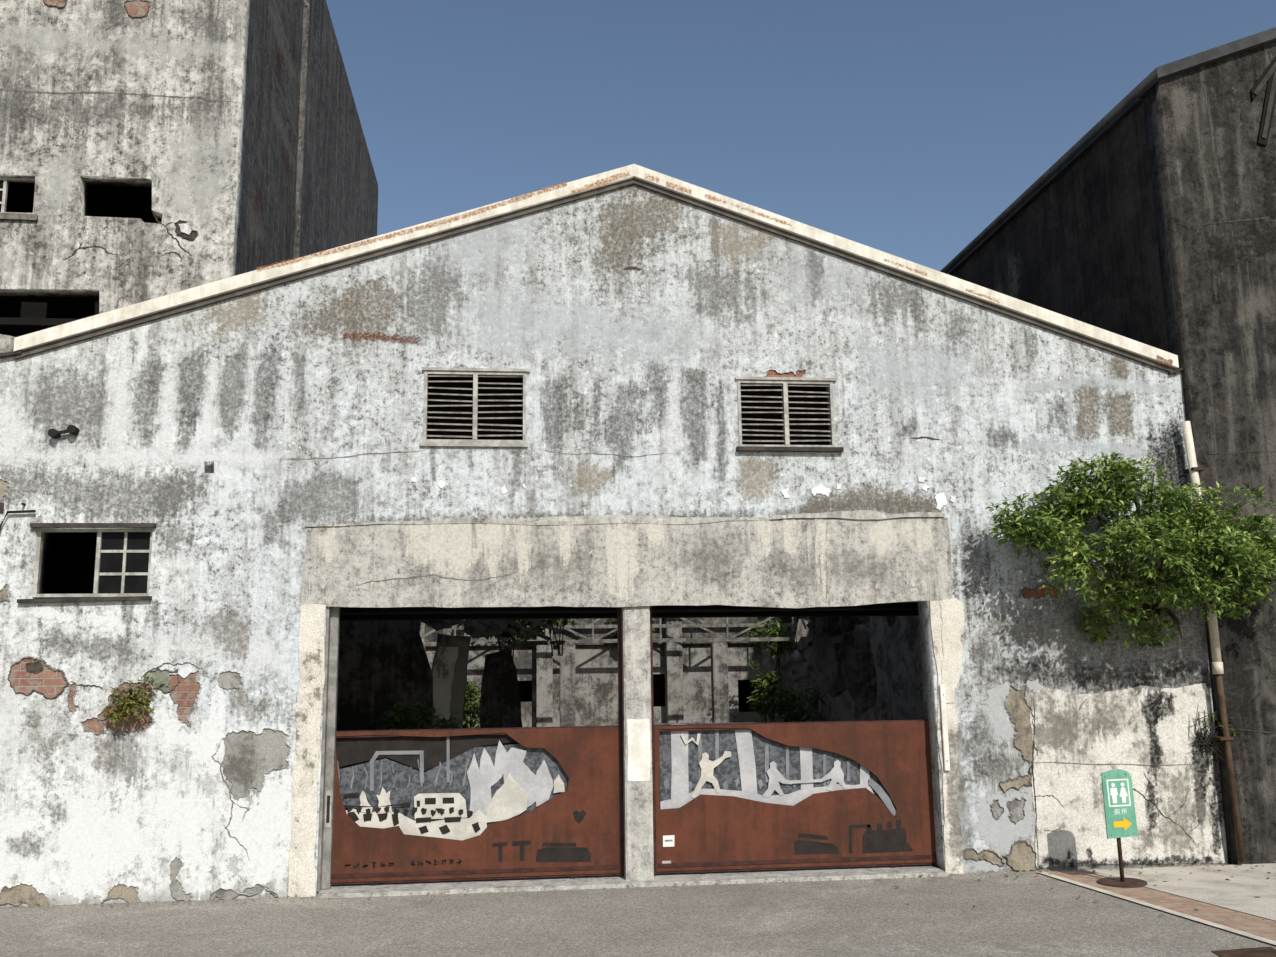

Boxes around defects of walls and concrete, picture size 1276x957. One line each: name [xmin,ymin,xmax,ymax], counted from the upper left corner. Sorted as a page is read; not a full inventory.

flaking render [43,0,67,9]
crack [64,242,119,260]
crack [153,214,192,261]
water stain [188,185,940,601]
water stain [989,355,1188,511]
water stain [39,601,284,673]
peeling [997,642,1047,664]
water stain [954,521,1269,870]
peeling [0,656,293,906]
crack [211,739,250,860]
peeling [963,678,1046,873]
crack [1032,698,1205,858]